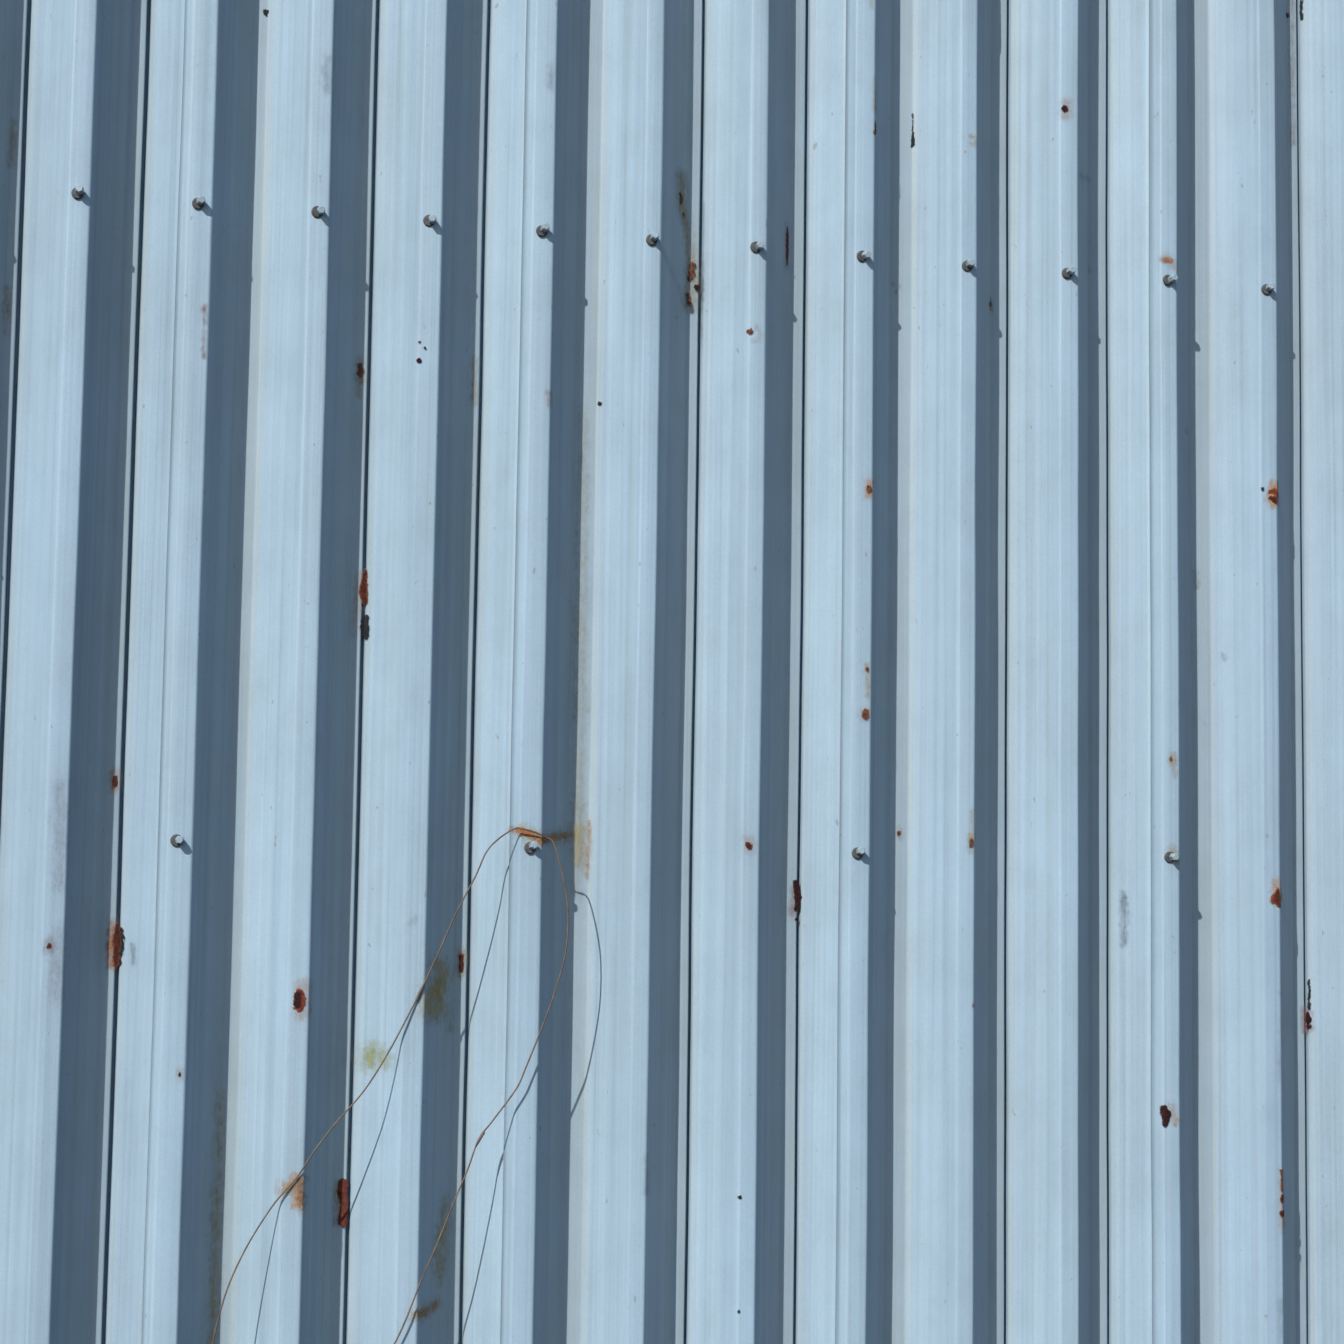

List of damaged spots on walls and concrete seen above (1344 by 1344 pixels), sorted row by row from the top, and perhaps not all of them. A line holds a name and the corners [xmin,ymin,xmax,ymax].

corrosion [686,255,700,305]
corrosion [1261,482,1278,506]
corrosion [359,568,369,640]
corrosion [515,821,590,843]
corrosion [1270,886,1281,907]
corrosion [107,923,125,967]
corrosion [293,988,306,1012]
corrosion [1160,1105,1176,1127]
corrosion [337,1178,349,1228]